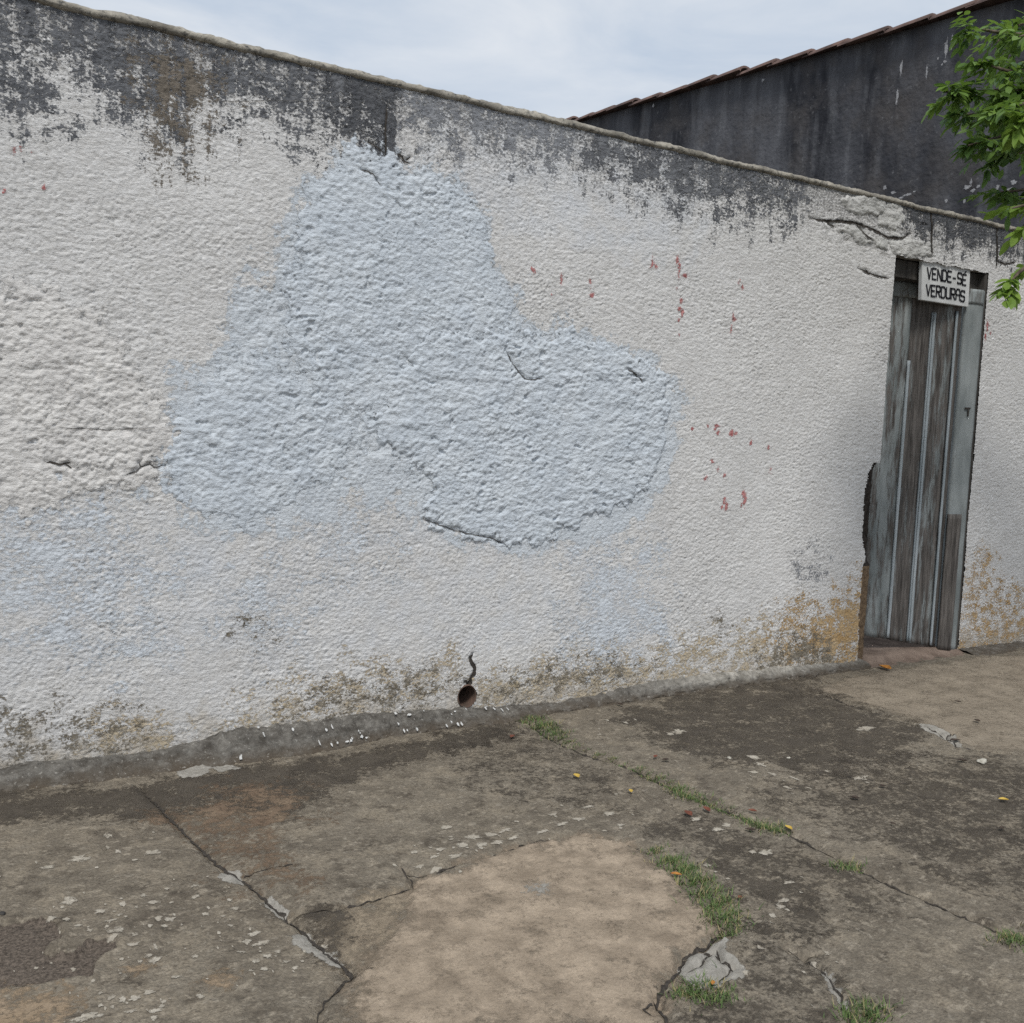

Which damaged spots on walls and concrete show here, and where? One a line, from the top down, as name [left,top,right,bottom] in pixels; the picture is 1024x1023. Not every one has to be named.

damp [0,0,823,249]
damp [901,205,1024,279]
crack [505,350,542,380]
crack [423,519,508,543]
crack [464,653,476,685]
damp [220,586,818,731]
crack [529,725,746,819]
crack [139,787,455,1022]
crack [787,834,1008,936]